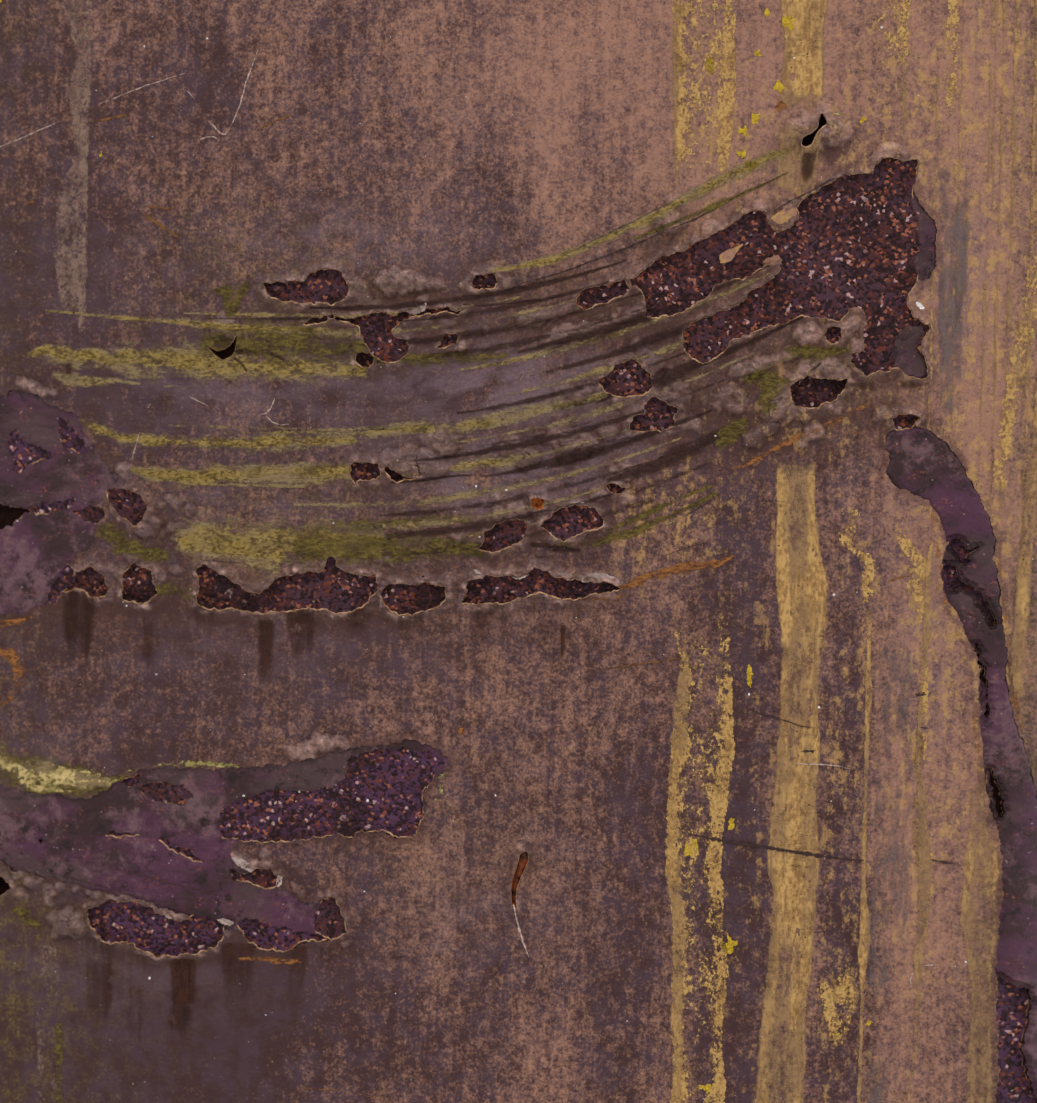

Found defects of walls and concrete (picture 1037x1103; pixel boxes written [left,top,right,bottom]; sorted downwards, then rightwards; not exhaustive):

damp [28,312,378,387]
peeling [0,376,636,630]
damp [80,365,626,489]
damp [98,438,681,578]
peeling [582,349,696,446]
peeling [563,142,945,423]
damp [979,0,1037,696]
peeling [0,732,456,969]
damp [665,615,735,1103]
damp [754,464,933,1103]
peeling [878,403,1037,1103]
damp [956,785,1000,1103]